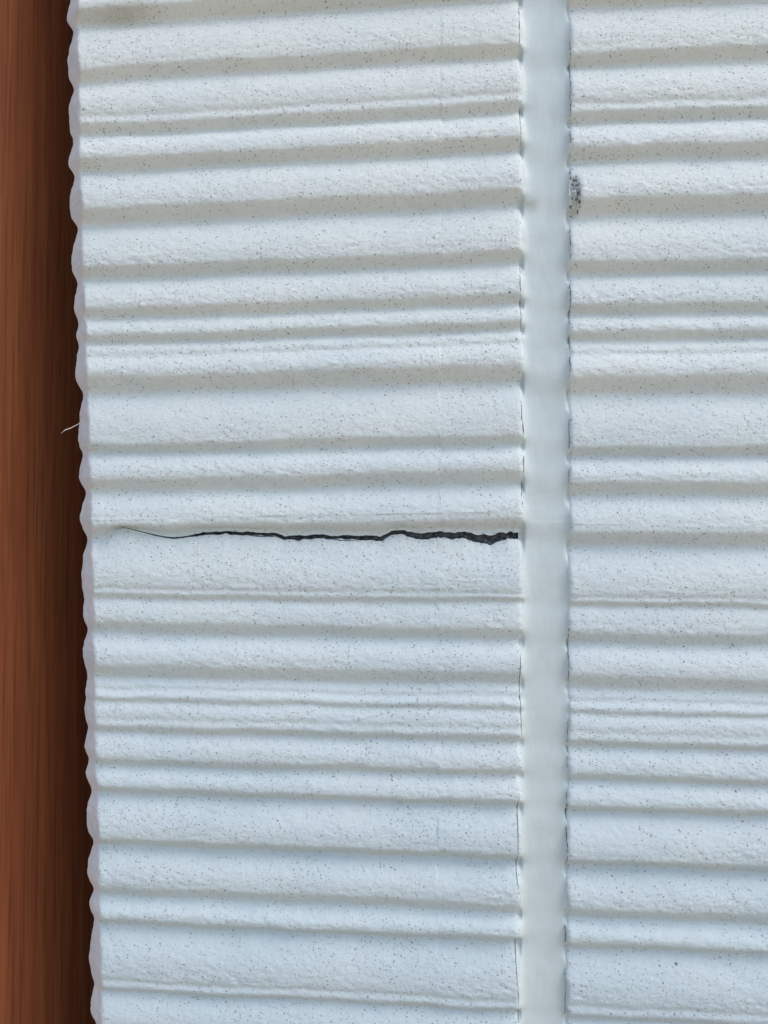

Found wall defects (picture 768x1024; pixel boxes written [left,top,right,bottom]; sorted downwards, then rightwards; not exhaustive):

crack [117,528,519,545]